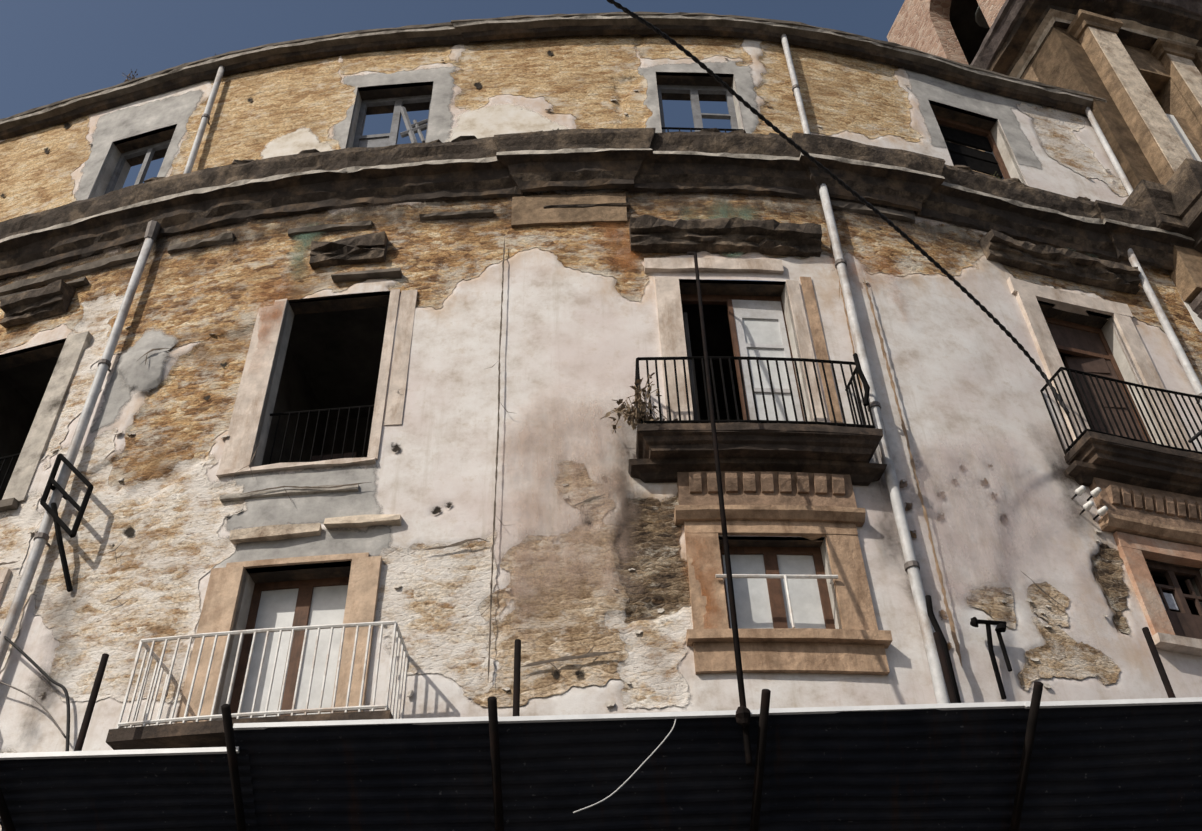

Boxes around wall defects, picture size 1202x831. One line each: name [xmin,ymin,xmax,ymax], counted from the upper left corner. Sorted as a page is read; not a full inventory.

flaking render [0,116,92,222]
flaking render [170,34,923,176]
peeling [1017,103,1128,197]
flaking render [1004,265,1202,385]
flaking render [0,189,984,709]
flaking render [1092,529,1131,634]
peeling [966,582,1121,690]